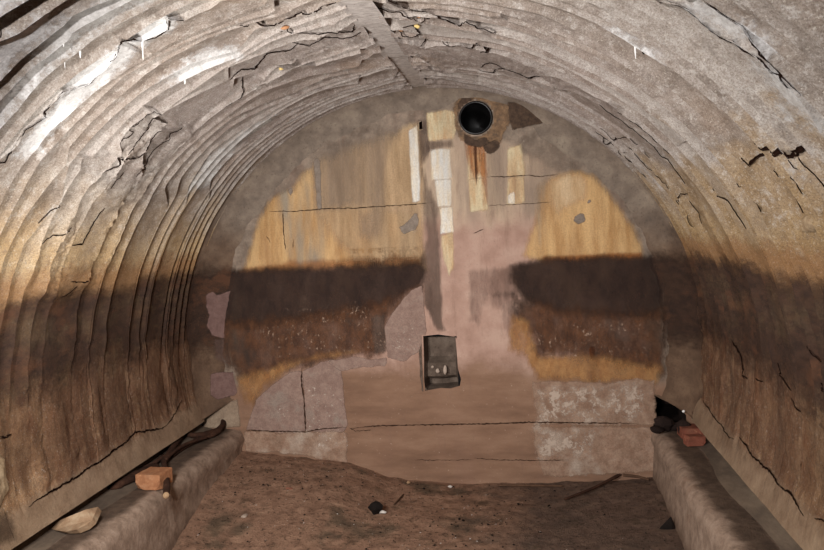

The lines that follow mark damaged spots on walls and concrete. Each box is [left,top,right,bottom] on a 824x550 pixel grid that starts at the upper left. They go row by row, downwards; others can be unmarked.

spalling [236,9,367,92]
spalling [393,17,582,94]
spalling [12,113,202,305]
corrosion [468,145,486,181]
crack [741,143,824,213]
water stain [0,111,456,416]
water stain [511,173,824,440]
crack [29,400,182,507]
peeling [203,286,427,462]
crack [247,371,636,433]
crack [703,401,824,522]
water stain [0,514,12,541]